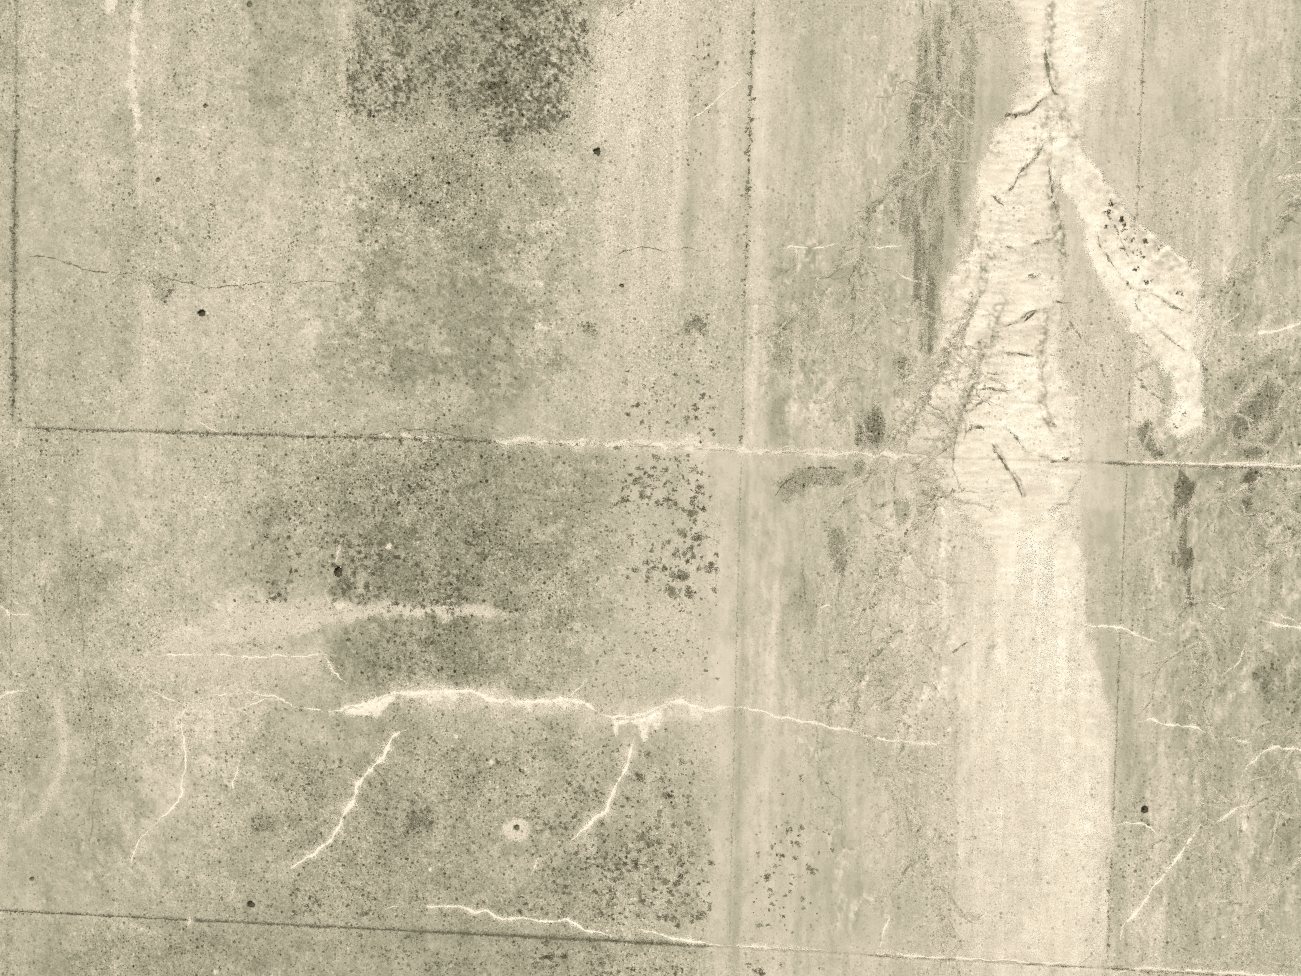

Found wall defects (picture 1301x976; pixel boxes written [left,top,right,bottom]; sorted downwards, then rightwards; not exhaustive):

leakage [103,0,175,207]
crack [1221,310,1301,343]
crack [0,534,98,848]
crack [321,539,344,617]
crack [127,642,944,871]
crack [382,903,829,960]
leakage [852,0,1284,976]
crack [865,716,1301,976]
crack [1081,621,1160,644]
crack [1221,613,1301,677]